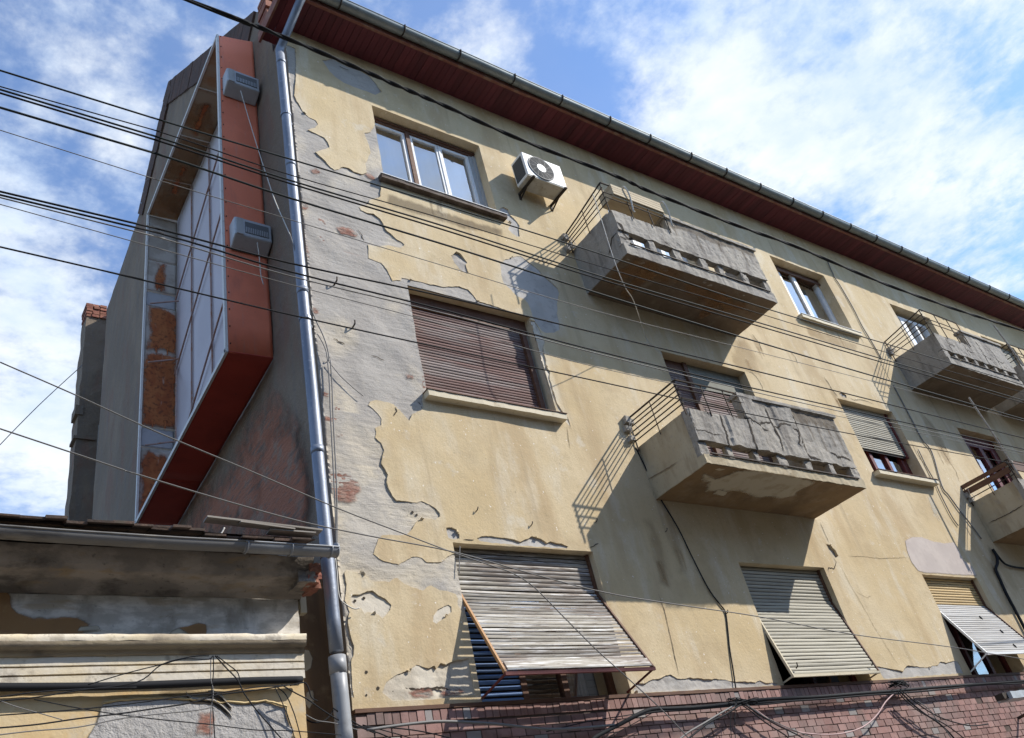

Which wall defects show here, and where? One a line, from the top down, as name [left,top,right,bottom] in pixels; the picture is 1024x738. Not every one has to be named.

flaking render [286,45,500,701]
flaking render [477,536,567,548]
peeling [0,593,100,634]
peeling [170,623,207,634]
flaking render [878,661,963,679]
flaking render [633,675,777,693]